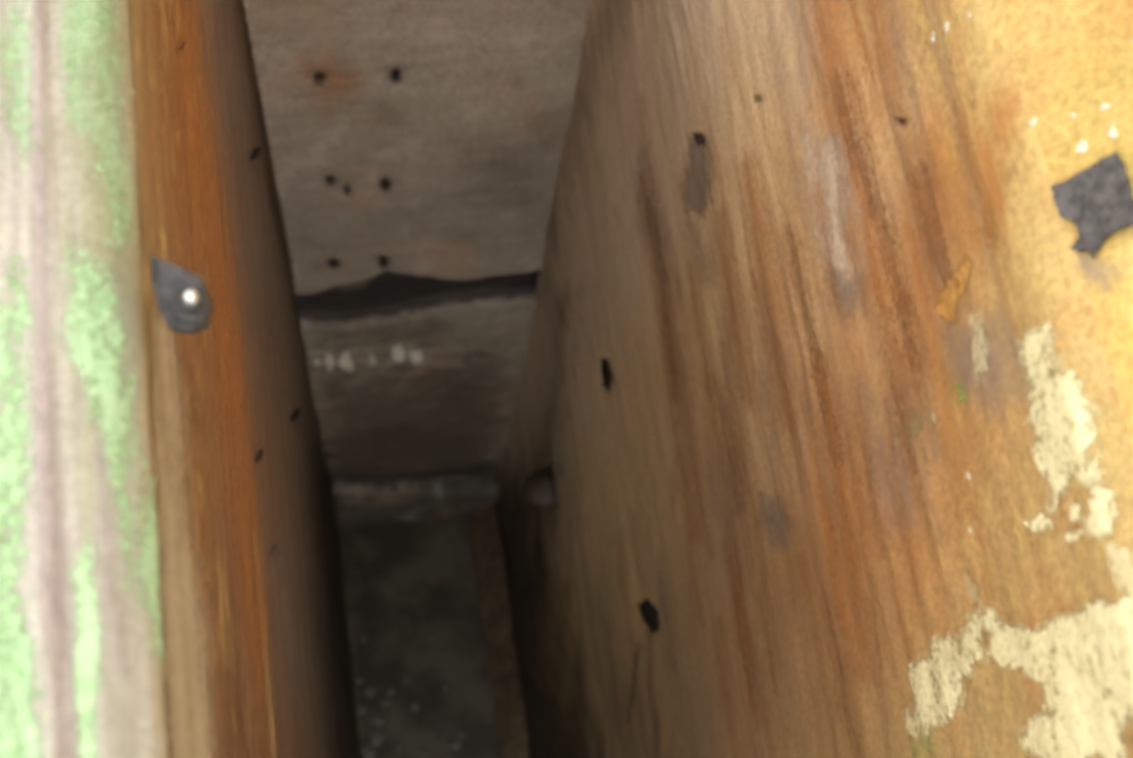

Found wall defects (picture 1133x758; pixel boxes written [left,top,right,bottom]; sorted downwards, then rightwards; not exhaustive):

peeling [905,324,1133,758]